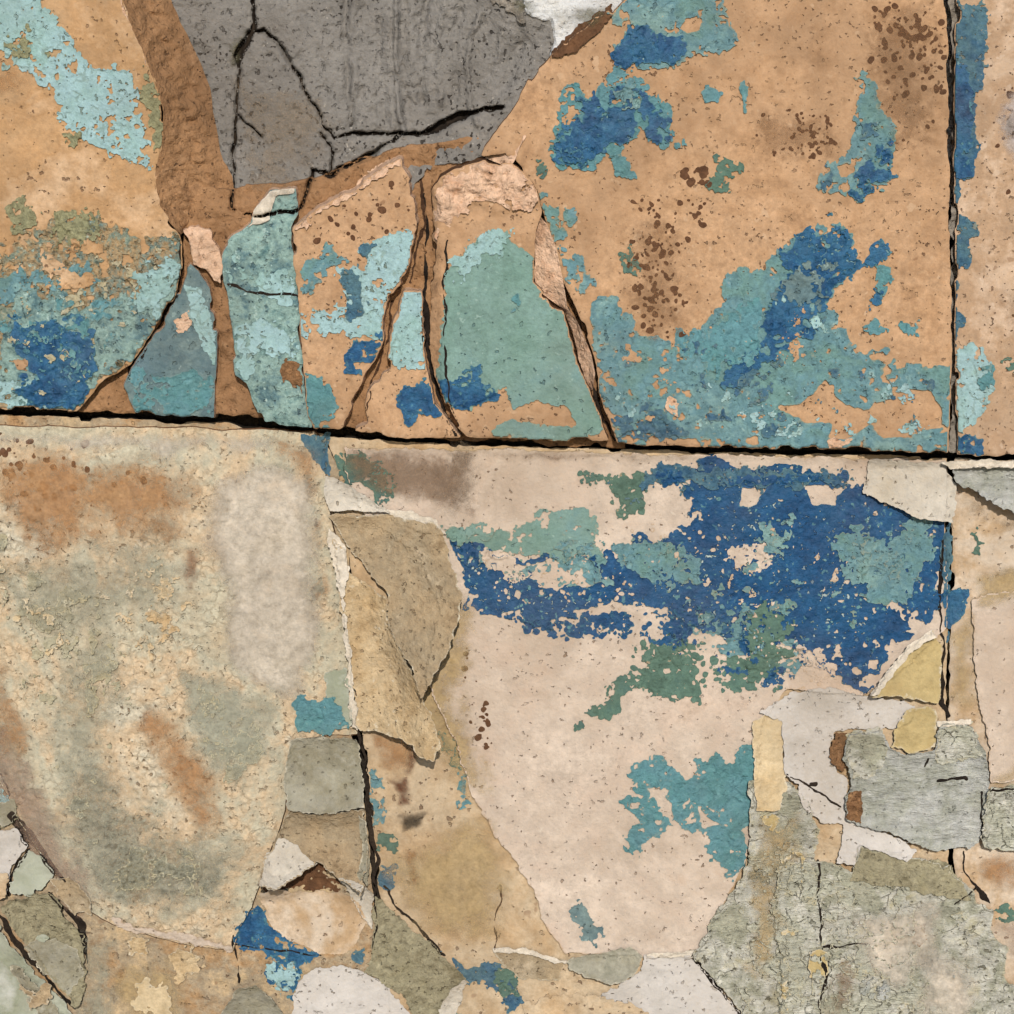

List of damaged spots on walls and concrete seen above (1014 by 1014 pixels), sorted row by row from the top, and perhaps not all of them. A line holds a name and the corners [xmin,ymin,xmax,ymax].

crack [230,0,505,218]
spalling [0,0,950,453]
peeling [772,0,991,269]
spalling [0,432,90,484]
crack [593,386,616,441]
peeling [0,550,197,718]
peeling [111,307,1014,1014]
crack [938,539,951,718]
crack [357,729,446,956]
crack [924,758,1014,905]